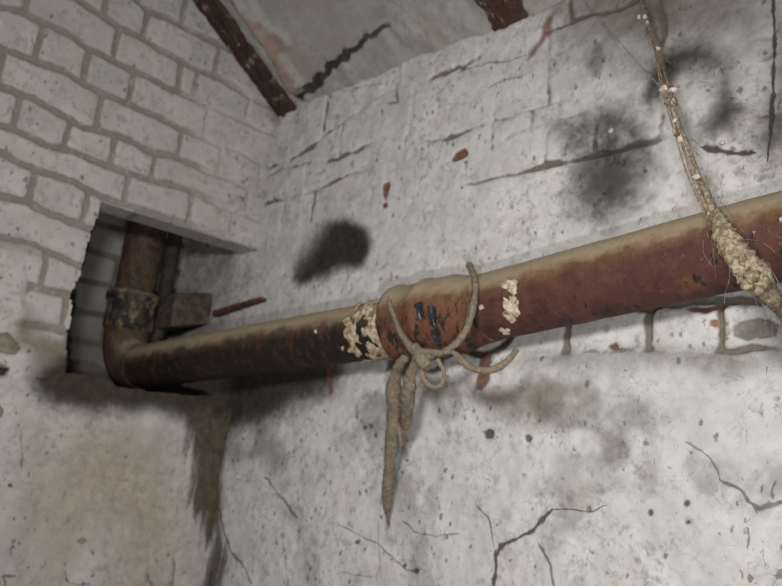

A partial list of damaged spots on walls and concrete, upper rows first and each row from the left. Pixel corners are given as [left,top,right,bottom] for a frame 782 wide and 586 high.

crack [702,0,777,162]
peeling [0,333,20,354]
damp [36,361,341,586]
crack [475,503,607,586]